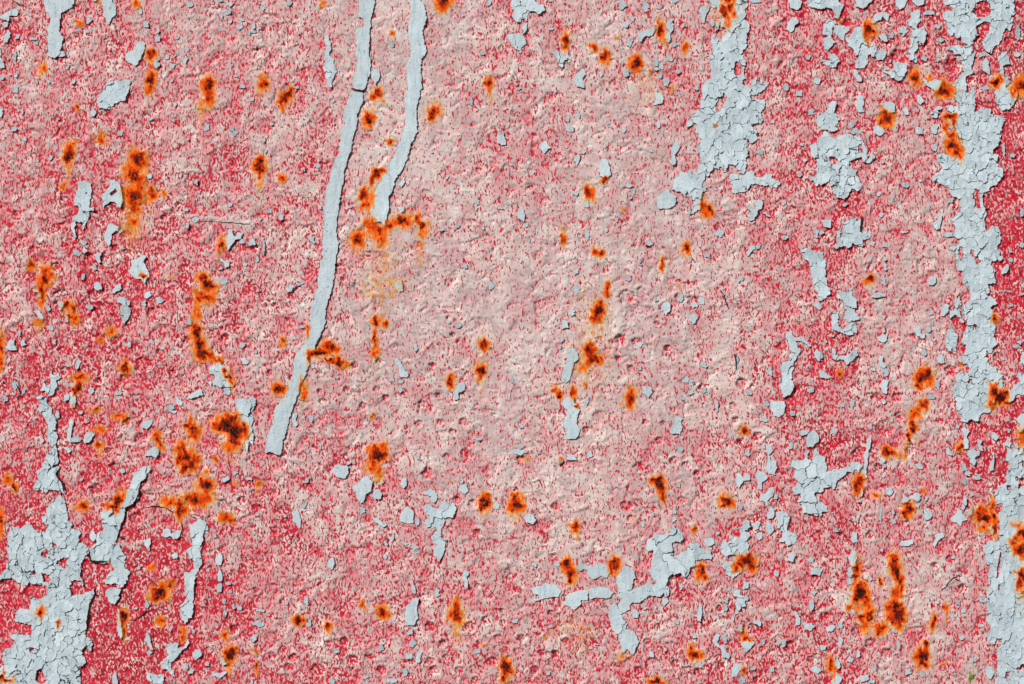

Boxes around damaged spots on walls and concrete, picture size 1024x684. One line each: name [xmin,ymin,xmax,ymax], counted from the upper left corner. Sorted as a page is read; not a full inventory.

peeling [370,0,427,225]
peeling [657,0,781,214]
peeling [0,359,159,684]
corrosion [151,411,250,524]
corrosion [184,271,236,389]
peeling [166,0,380,455]
corrosion [350,167,430,297]
corrosion [550,280,610,409]
peeling [531,444,822,684]
corrosion [846,552,909,637]
peeling [760,0,1024,684]
corrosion [880,366,935,460]